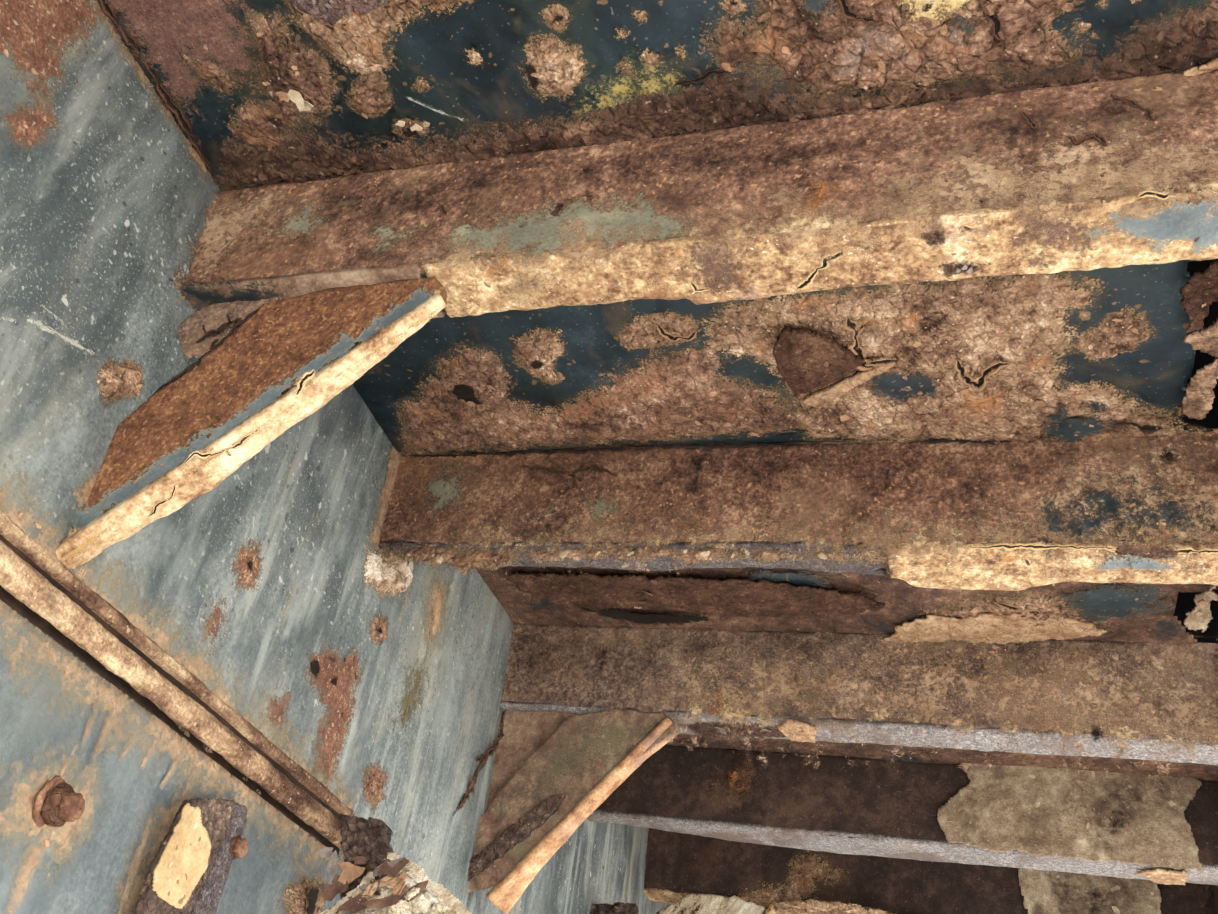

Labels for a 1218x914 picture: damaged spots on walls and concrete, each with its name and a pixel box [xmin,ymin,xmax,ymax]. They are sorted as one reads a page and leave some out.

spalling [698,0,1090,107]
peeling [1184,58,1218,76]
spalling [393,116,430,140]
rust [0,0,1218,302]
rust [96,356,146,407]
crack [150,308,259,398]
rust [363,121,1218,792]
rust [0,469,388,812]
rust [0,600,344,914]